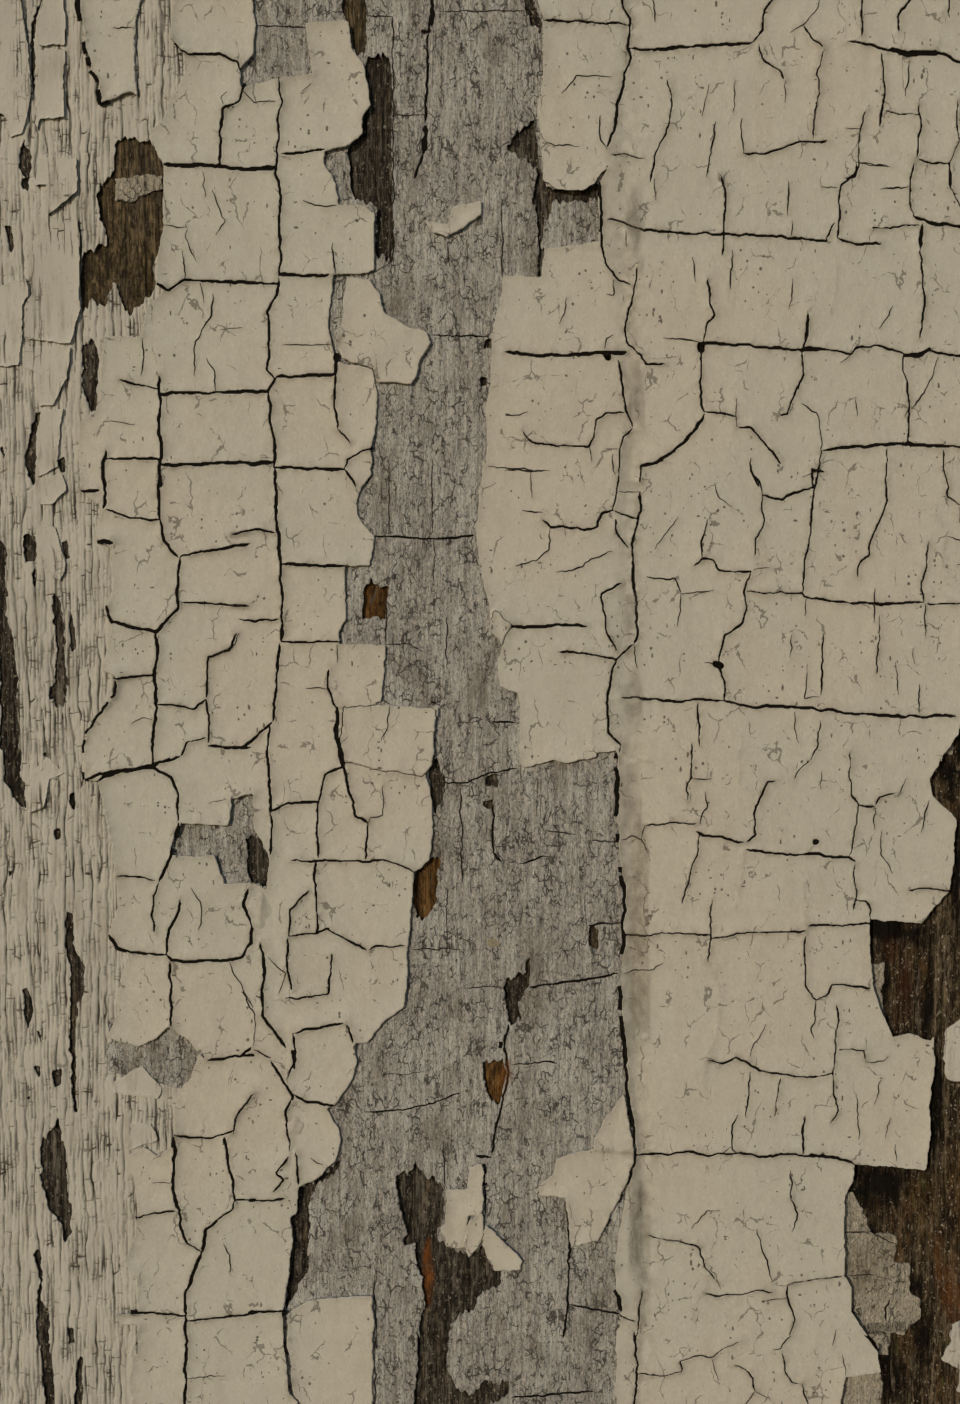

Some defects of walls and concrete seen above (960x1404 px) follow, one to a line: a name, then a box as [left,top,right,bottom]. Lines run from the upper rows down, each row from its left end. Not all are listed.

peeling [0,278,28,367]
peeling [0,0,66,137]
crack [0,0,517,1404]
peeling [23,0,635,1404]
crack [511,1390,593,1398]
crack [368,0,960,1231]
peeling [476,0,960,1404]
crack [562,1205,896,1404]